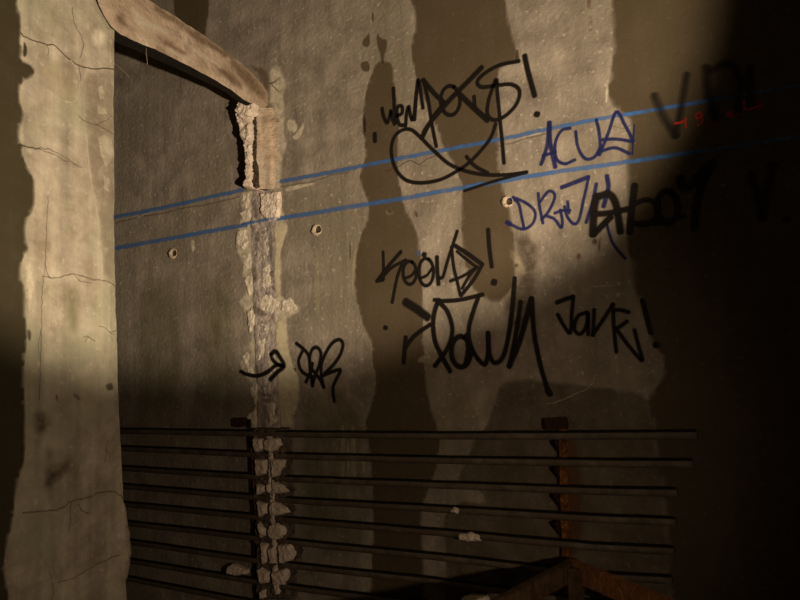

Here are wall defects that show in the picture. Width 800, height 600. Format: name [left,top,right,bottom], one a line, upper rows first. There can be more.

crack [20,32,115,70]
spalling [233,65,304,600]
leakage [350,34,439,599]